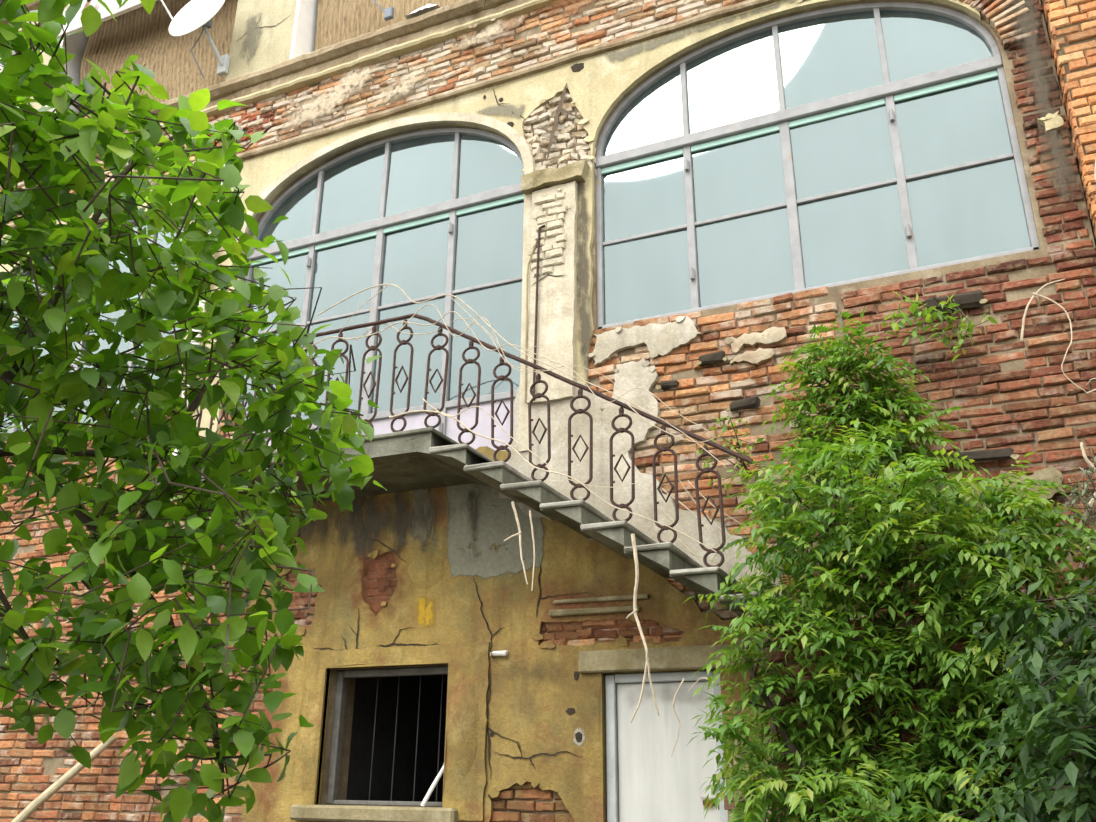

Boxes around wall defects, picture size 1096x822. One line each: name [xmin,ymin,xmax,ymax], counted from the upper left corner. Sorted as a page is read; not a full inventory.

spalling [507,91,597,176]
peeling [528,188,567,277]
peeling [696,327,787,367]
peeling [588,316,703,458]
spalling [726,396,761,412]
damp [298,488,435,554]
spalling [353,549,398,613]
crack [314,609,439,651]
spalling [532,595,681,649]
crack [473,578,583,779]
spalling [489,777,575,822]